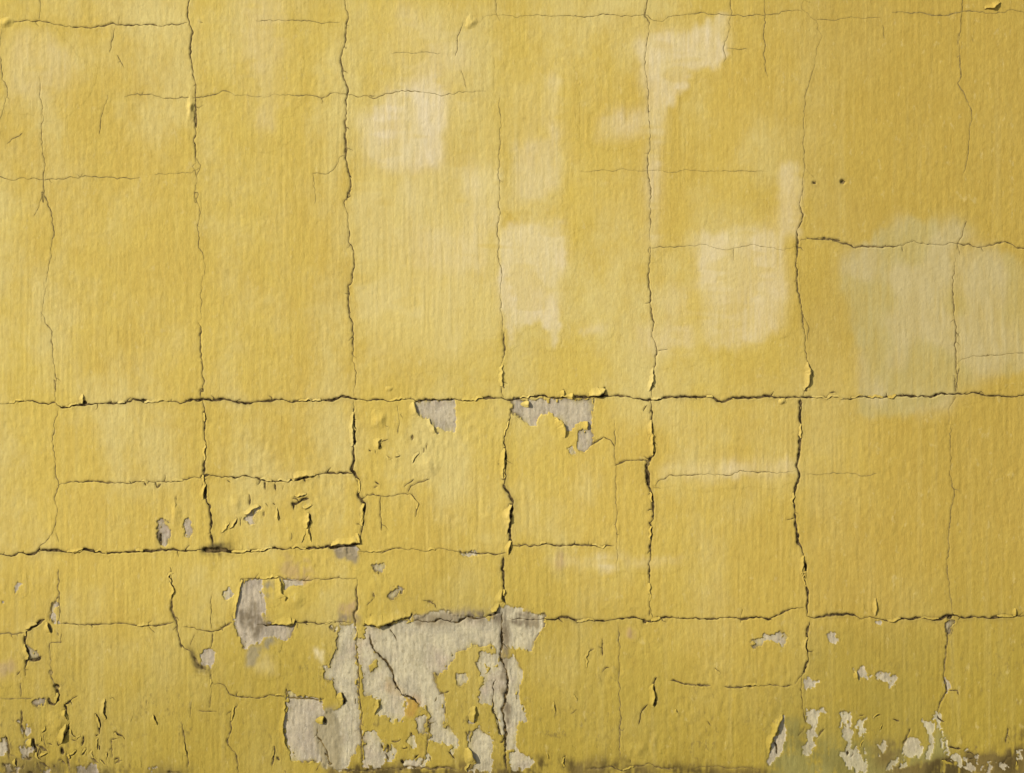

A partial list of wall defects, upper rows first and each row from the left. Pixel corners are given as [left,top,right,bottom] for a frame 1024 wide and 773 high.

crack [642,0,878,236]
crack [895,0,1022,171]
crack [0,0,466,387]
crack [494,127,502,241]
peeling [409,398,456,435]
crack [0,163,1024,773]
peeling [511,395,595,455]
peeling [156,518,193,547]
peeling [223,579,266,649]
peeling [278,691,323,763]
peeling [324,613,547,773]
peeling [751,631,787,649]